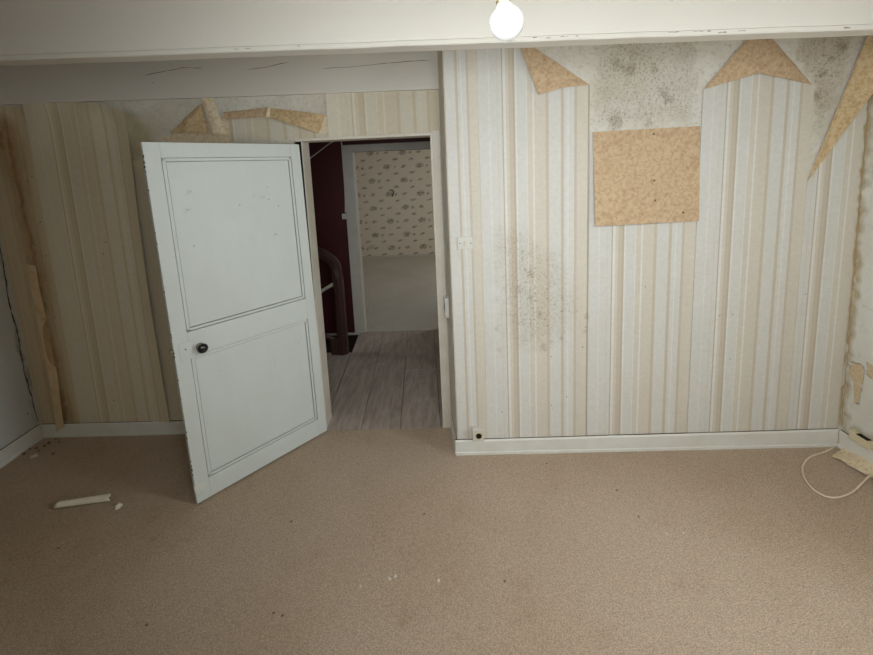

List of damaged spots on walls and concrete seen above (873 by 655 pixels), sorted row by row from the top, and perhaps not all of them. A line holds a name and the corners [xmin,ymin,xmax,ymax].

peeling [848,362,873,403]